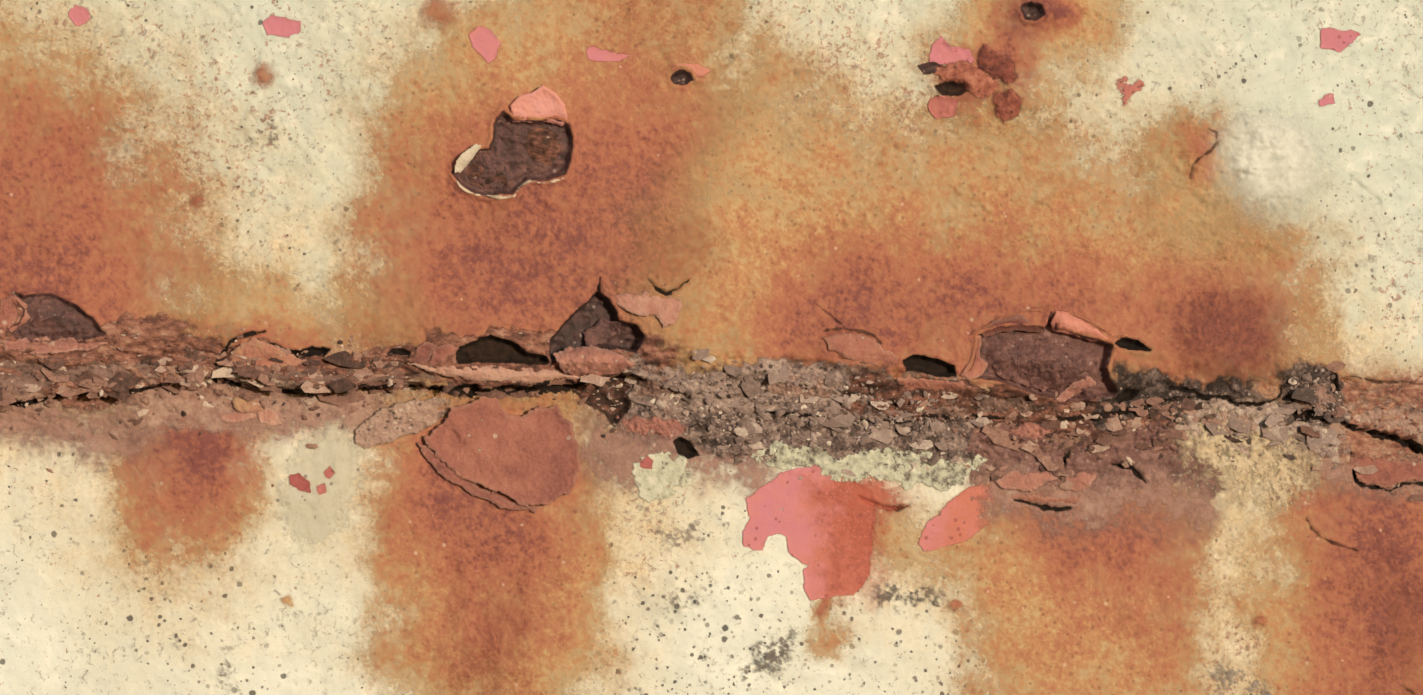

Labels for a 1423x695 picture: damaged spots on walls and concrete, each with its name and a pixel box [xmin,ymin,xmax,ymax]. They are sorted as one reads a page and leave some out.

peeling [928,95,959,119]
peeling [918,36,975,74]
peeling [613,291,683,328]
rust [0,0,1323,573]
peeling [218,397,282,426]
rust [361,415,613,695]
peeling [743,465,876,600]
peeling [919,484,989,551]
rust [829,427,1219,695]
rust [1231,369,1423,695]